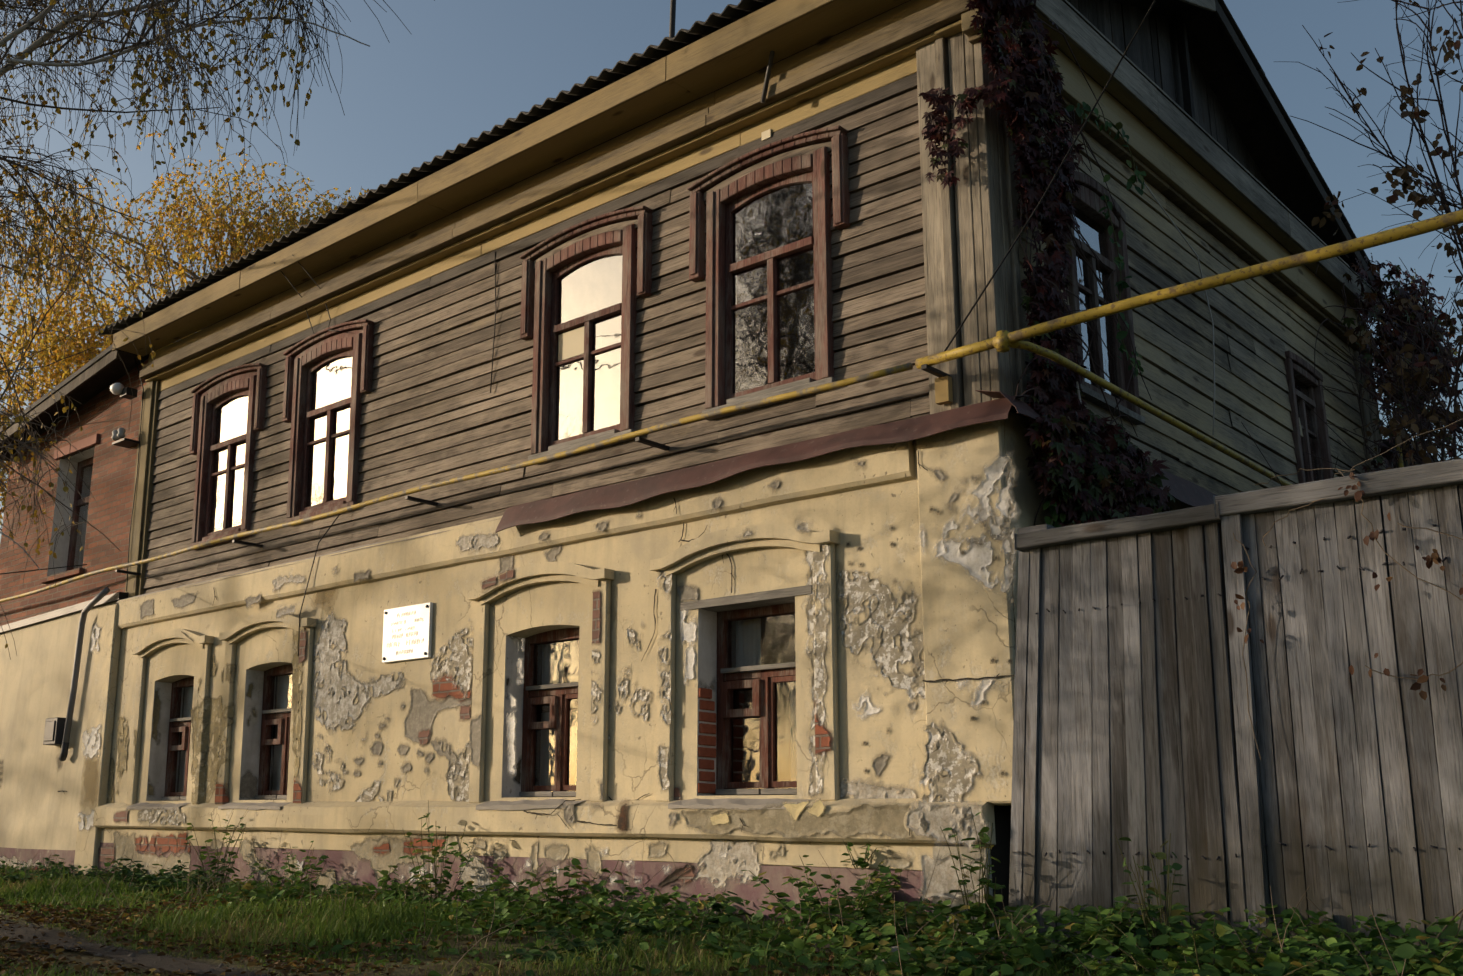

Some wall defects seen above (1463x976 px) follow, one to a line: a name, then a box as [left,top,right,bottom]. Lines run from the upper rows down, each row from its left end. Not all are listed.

peeling [921,457,1017,603]
peeling [78,656,257,877]
peeling [276,606,481,803]
peeling [506,648,523,784]
peeling [526,522,1011,940]
peeling [240,839,337,892]
peeling [351,835,506,901]